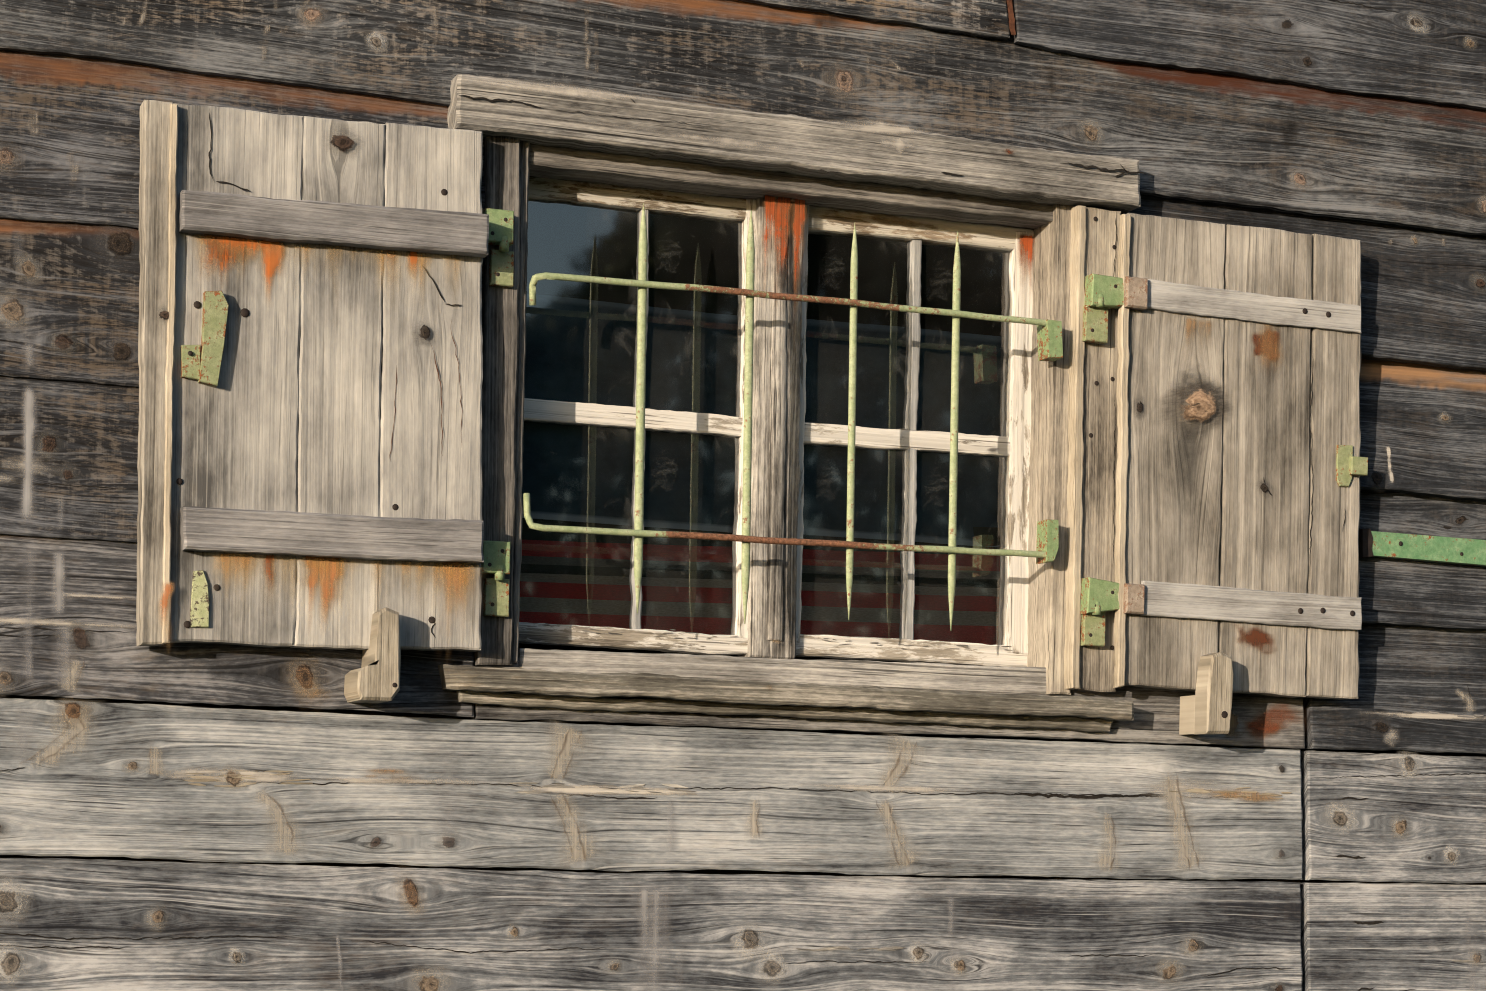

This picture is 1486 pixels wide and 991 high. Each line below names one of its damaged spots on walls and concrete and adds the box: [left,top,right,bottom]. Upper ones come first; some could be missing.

crack [208,109,251,192]
rust [201,235,283,287]
rust [763,195,805,287]
rust [1253,330,1279,360]
rust [220,554,274,581]
rust [305,556,344,607]
rust [402,562,467,593]
rust [1239,628,1273,649]